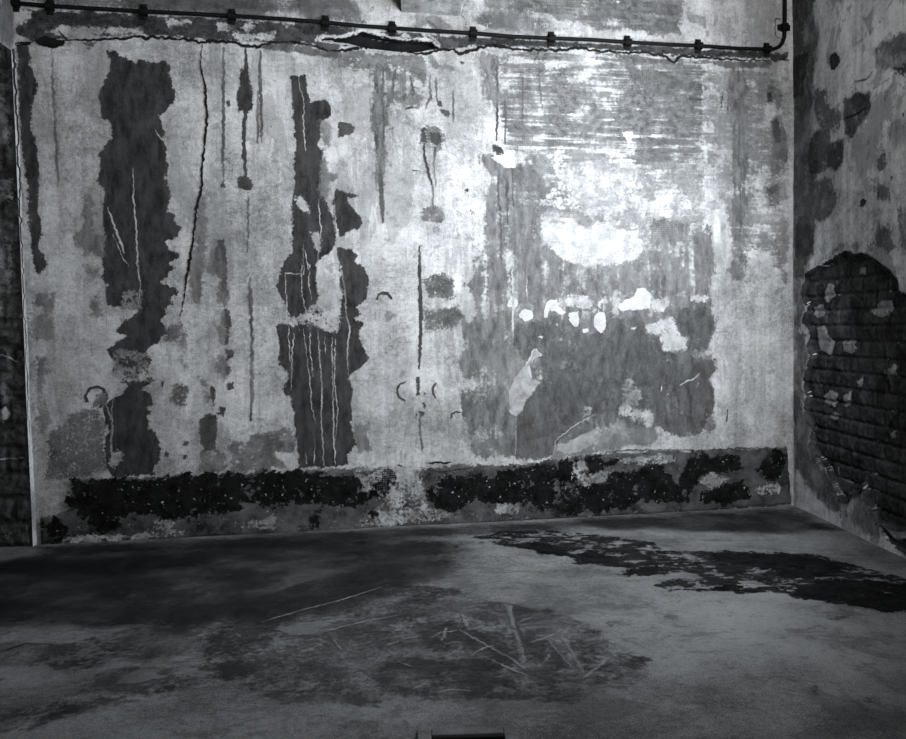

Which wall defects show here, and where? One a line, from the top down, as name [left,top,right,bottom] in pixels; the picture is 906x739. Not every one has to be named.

leakage [33,0,367,24]
leakage [466,0,684,40]
peeling [829,51,840,70]
crack [851,63,906,89]
leakage [875,32,906,66]
leakage [0,0,47,274]
crack [15,17,788,406]
peeling [13,8,790,460]
leakage [0,47,906,628]
flaking render [539,380,716,486]
flaking render [801,220,906,554]
flaking render [356,465,439,527]